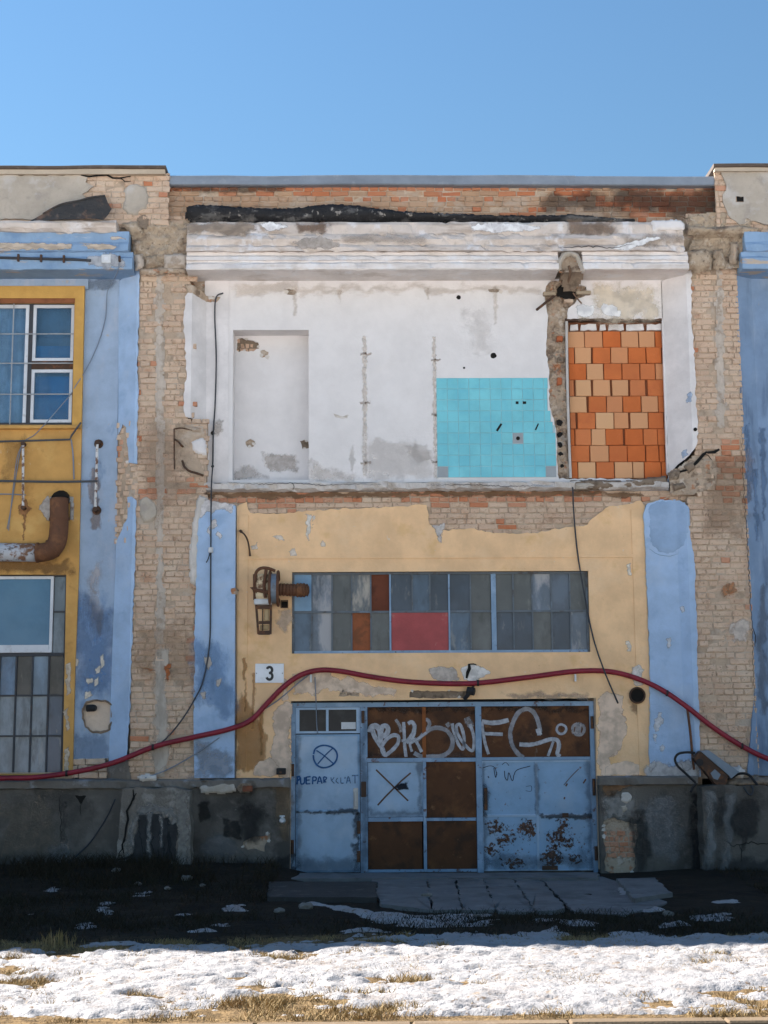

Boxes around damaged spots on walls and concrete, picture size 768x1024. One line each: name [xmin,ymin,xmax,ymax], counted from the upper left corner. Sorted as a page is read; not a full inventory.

flaking render [115,425,138,543]
crack [680,426,756,704]
flaking render [409,665,490,699]
peeling [175,672,397,864]
peeling [596,691,647,776]
crack [119,789,137,854]
leakage [116,804,178,864]
rust [484,818,589,873]
flaking render [602,792,638,873]
leakage [688,791,768,871]